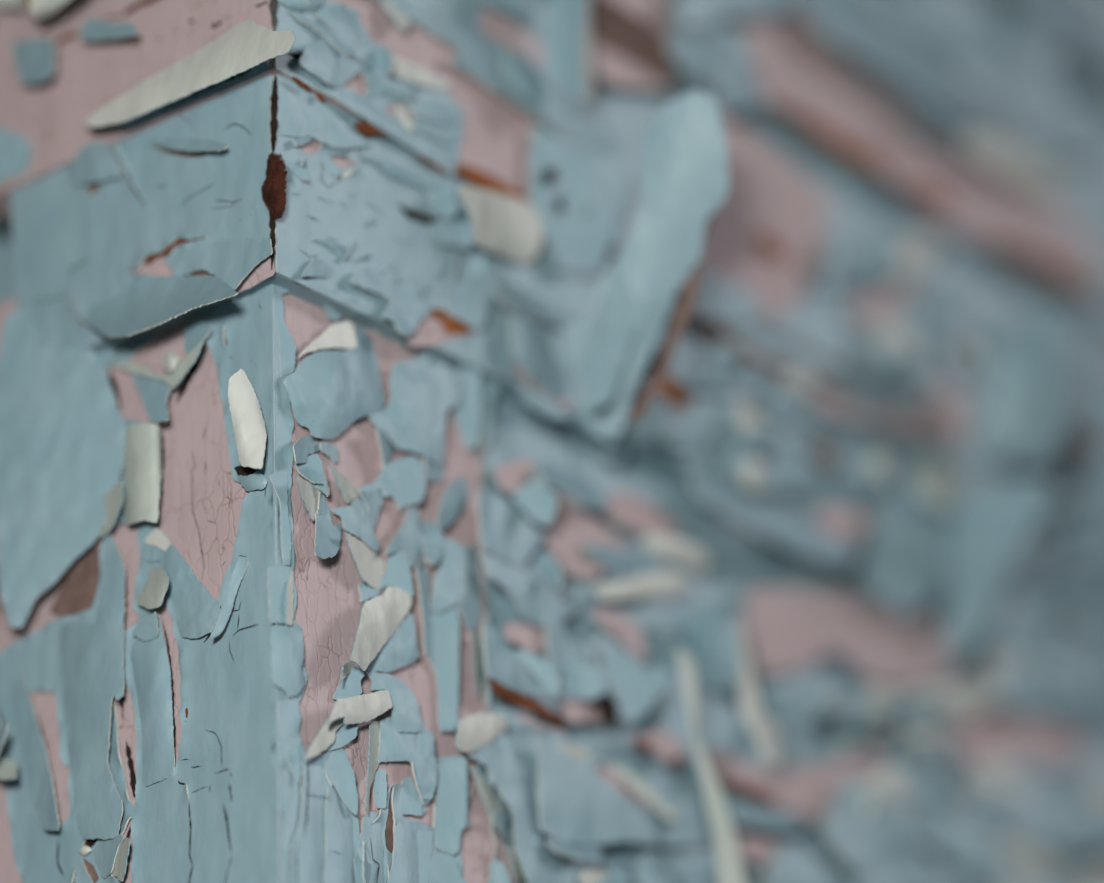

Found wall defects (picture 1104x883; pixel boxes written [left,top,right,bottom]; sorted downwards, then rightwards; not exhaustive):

rust [261,153,288,220]
rust [292,76,324,102]
rust [353,120,389,137]
rust [416,153,527,202]
peeling [591,0,1104,327]
peeling [0,0,711,883]
peeling [651,333,955,689]
peeling [978,526,1104,729]
crack [57,842,76,883]
crack [166,730,232,883]
crack [370,787,393,883]
peeling [707,747,1104,883]